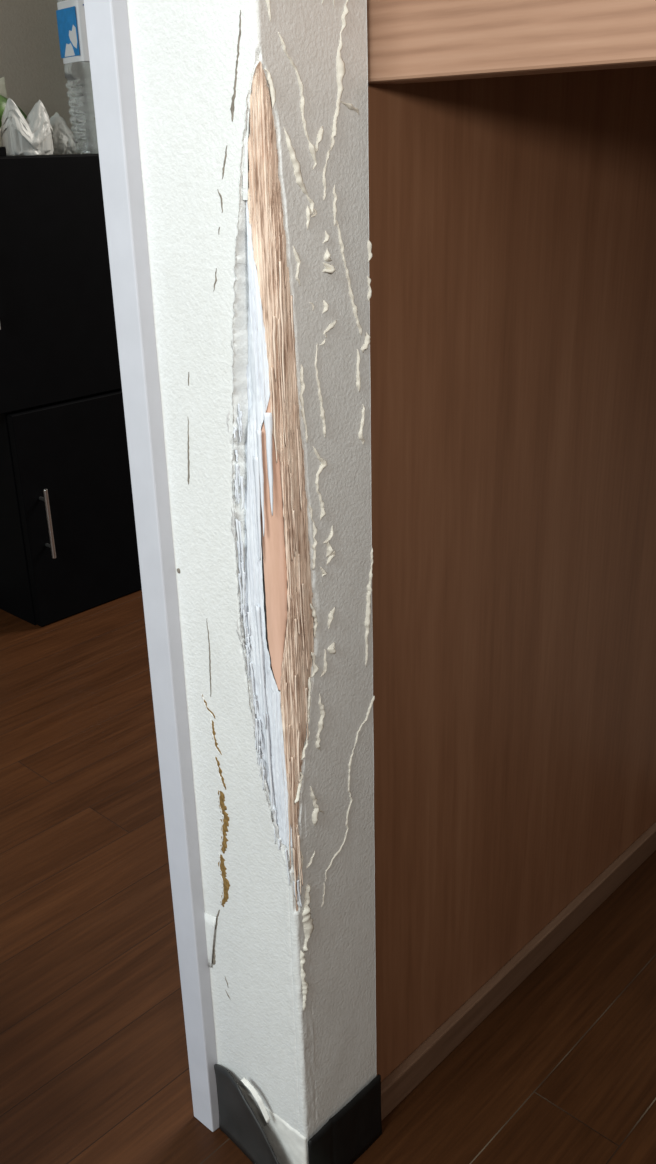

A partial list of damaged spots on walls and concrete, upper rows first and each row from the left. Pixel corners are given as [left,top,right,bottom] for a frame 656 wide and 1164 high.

peeling [204,910,220,967]
spalling [227,0,373,1011]